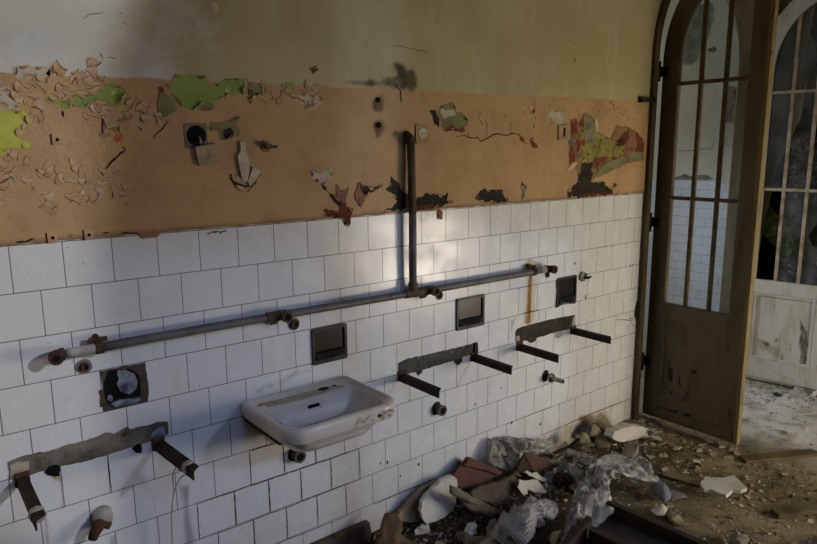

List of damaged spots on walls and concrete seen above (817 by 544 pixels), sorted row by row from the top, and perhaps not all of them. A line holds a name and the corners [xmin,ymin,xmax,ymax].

leakage [386,64,416,89]
peeling [0,57,324,216]
peeling [430,102,468,133]
crack [456,123,535,144]
peeling [545,109,644,199]
flaking render [756,3,817,285]
peeling [311,168,453,226]
peeling [475,188,510,203]
corrosion [523,275,538,323]
hole [103,368,141,403]
spalling [8,421,169,480]